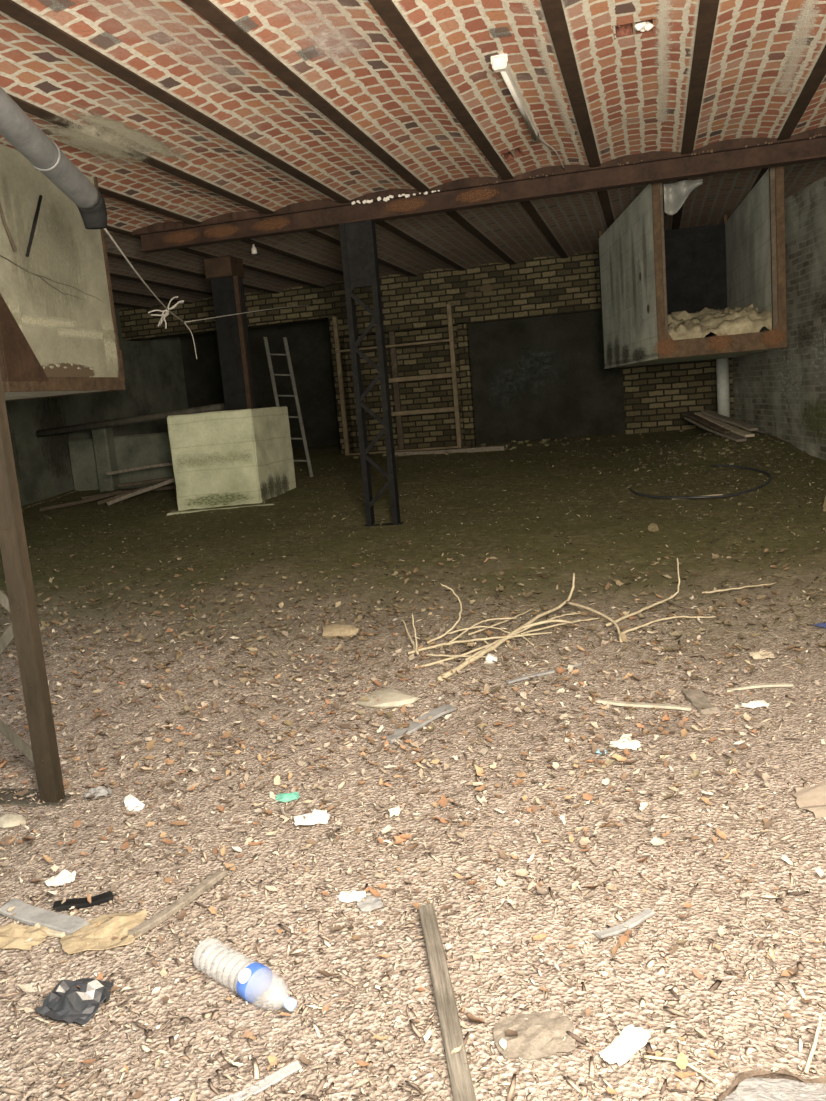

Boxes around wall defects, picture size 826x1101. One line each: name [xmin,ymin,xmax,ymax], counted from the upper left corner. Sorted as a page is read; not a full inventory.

damp [655,0,673,123]